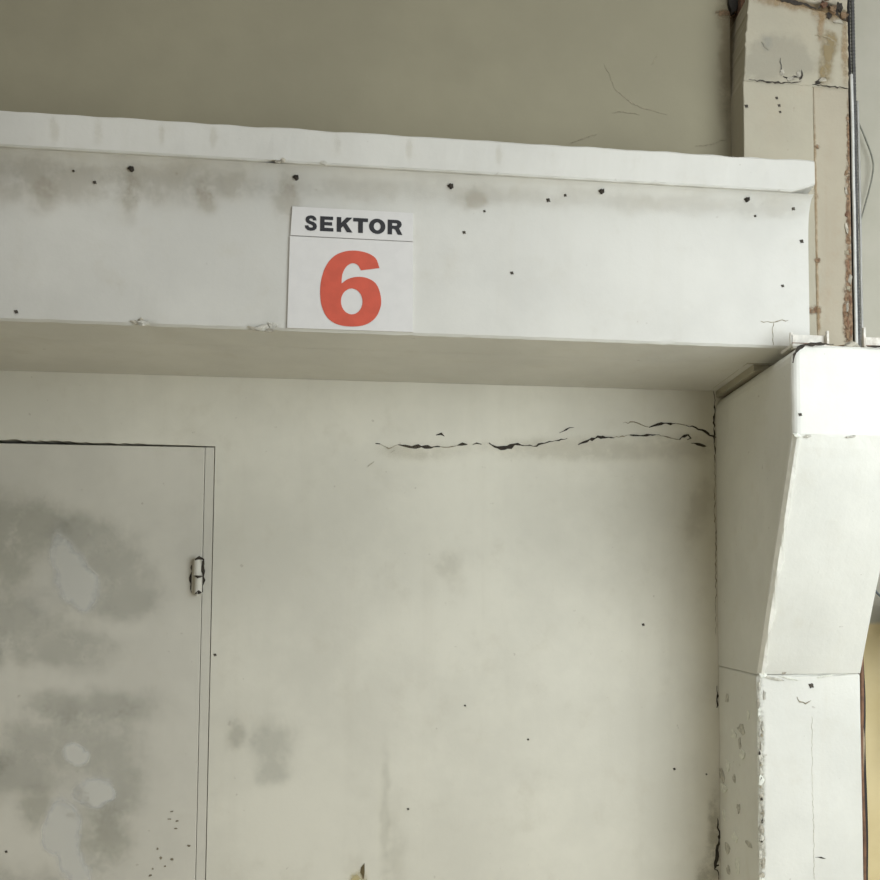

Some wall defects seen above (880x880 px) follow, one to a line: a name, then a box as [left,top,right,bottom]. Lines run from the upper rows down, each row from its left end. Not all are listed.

corrosion [819,33,837,78]
corrosion [843,104,853,342]
crack [370,391,717,632]
peeling [725,672,797,880]